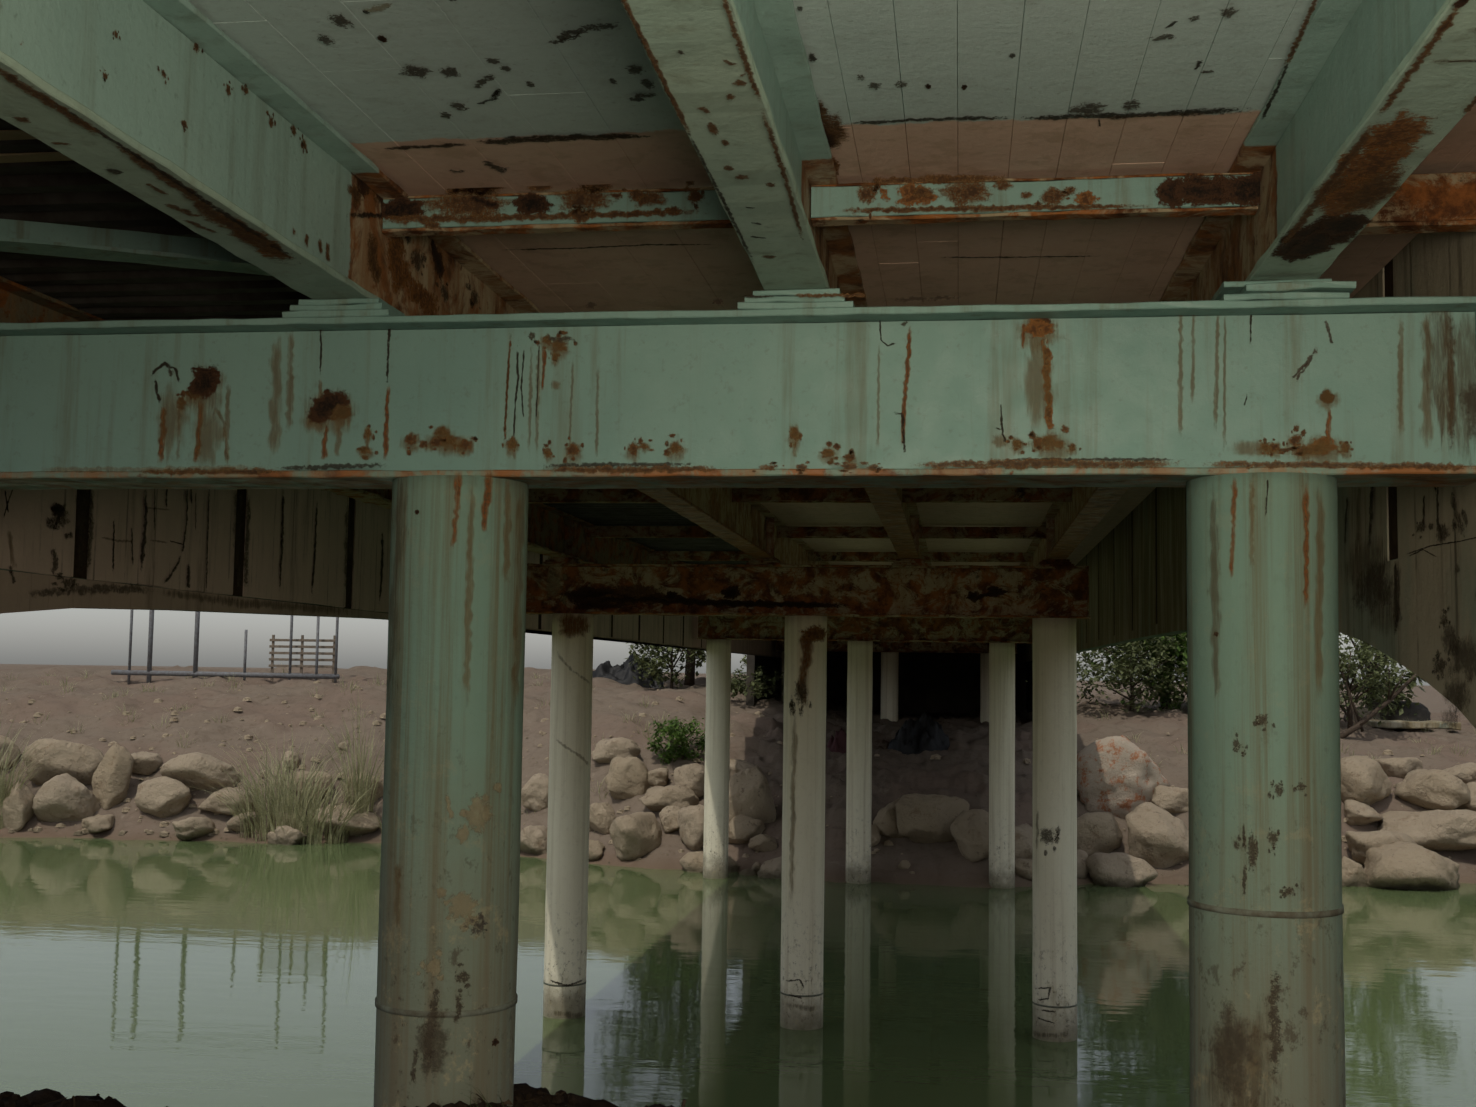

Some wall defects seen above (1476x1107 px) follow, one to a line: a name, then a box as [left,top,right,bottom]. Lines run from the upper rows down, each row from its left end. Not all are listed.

corrosion [348,0,776,316]
corrosion [723,0,802,238]
corrosion [845,172,1261,219]
corrosion [1271,0,1469,263]
corrosion [143,362,382,476]
corrosion [405,425,477,456]
corrosion [919,318,1179,470]
corrosion [1212,389,1465,575]
leakage [32,584,144,597]
corrosion [1302,489,1310,604]
leakage [1214,973,1284,1095]